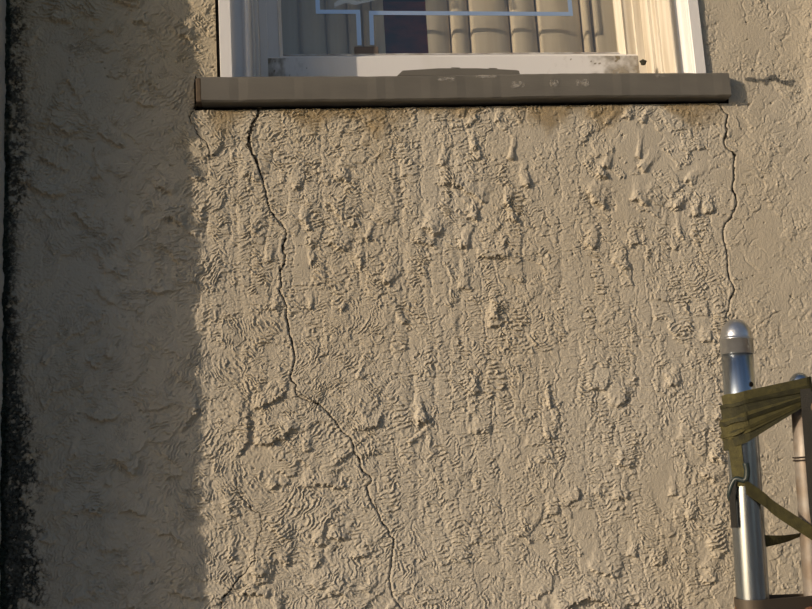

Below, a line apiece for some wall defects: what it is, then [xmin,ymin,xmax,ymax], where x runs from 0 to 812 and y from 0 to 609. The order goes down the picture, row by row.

crack [189,76,214,155]
crack [721,108,737,314]
crack [245,107,401,608]
crack [215,472,263,608]